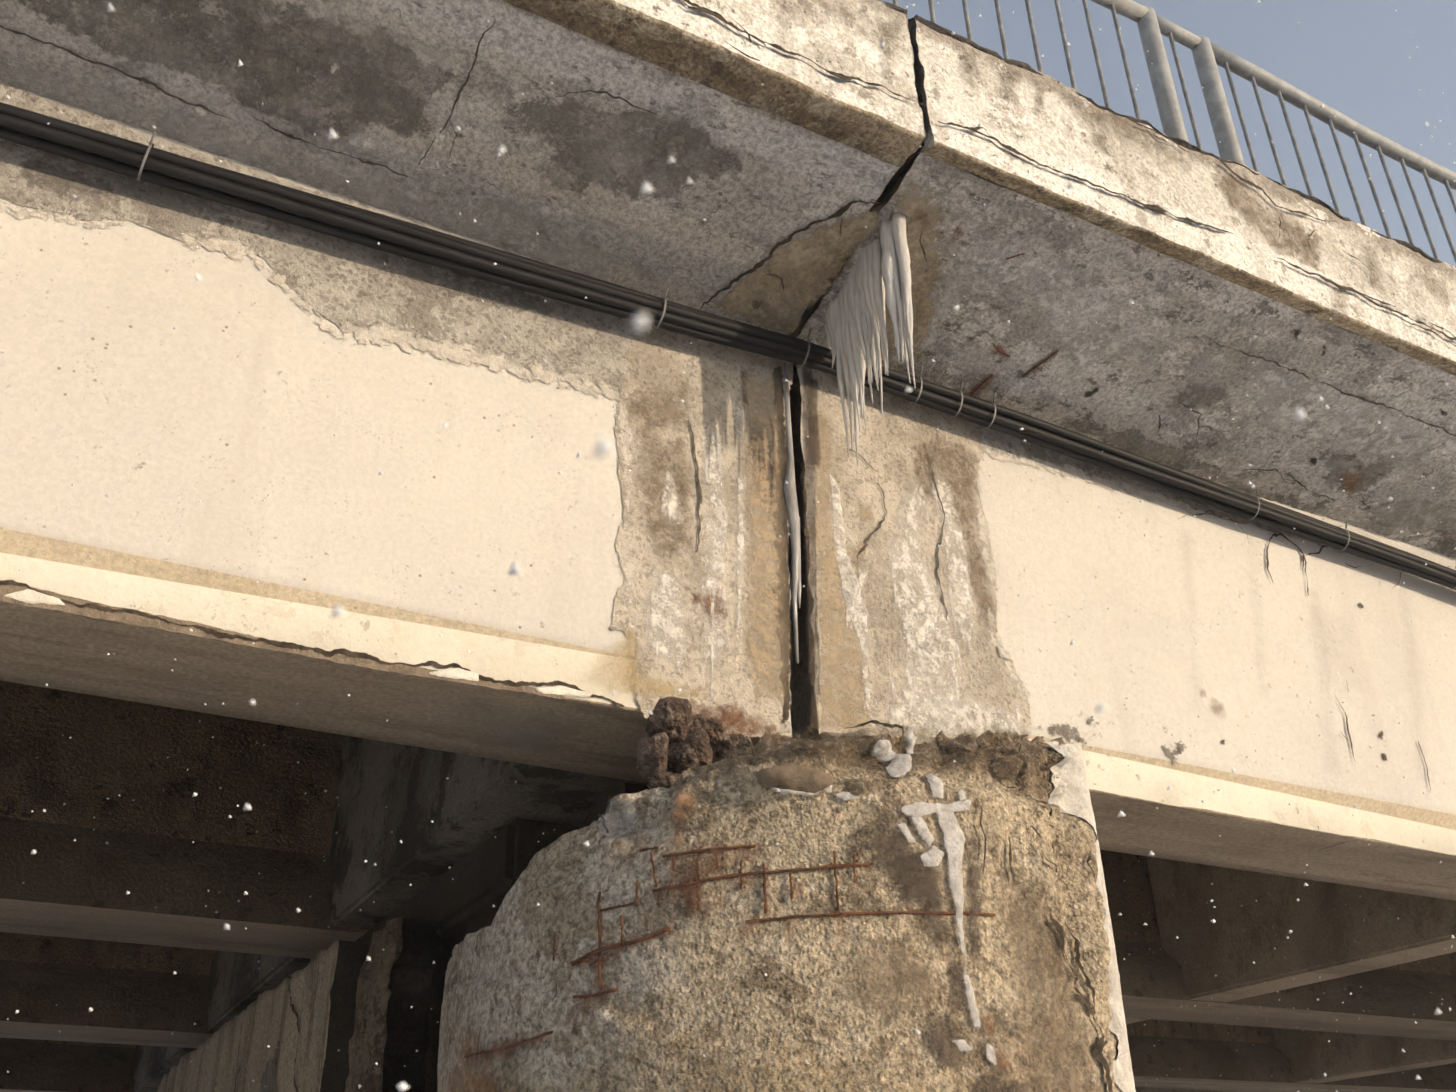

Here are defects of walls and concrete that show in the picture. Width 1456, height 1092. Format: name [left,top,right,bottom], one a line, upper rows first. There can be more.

peeling [0,79,427,228]
leakage [19,0,452,172]
crack [0,19,496,177]
leakage [500,94,742,223]
crack [680,0,1233,234]
crack [1117,114,1456,347]
peeling [0,139,1366,797]
spalling [552,844,996,999]
leakage [849,806,954,947]
crack [847,720,1113,1092]
peeling [1039,723,1136,1092]
leakage [921,962,969,1067]